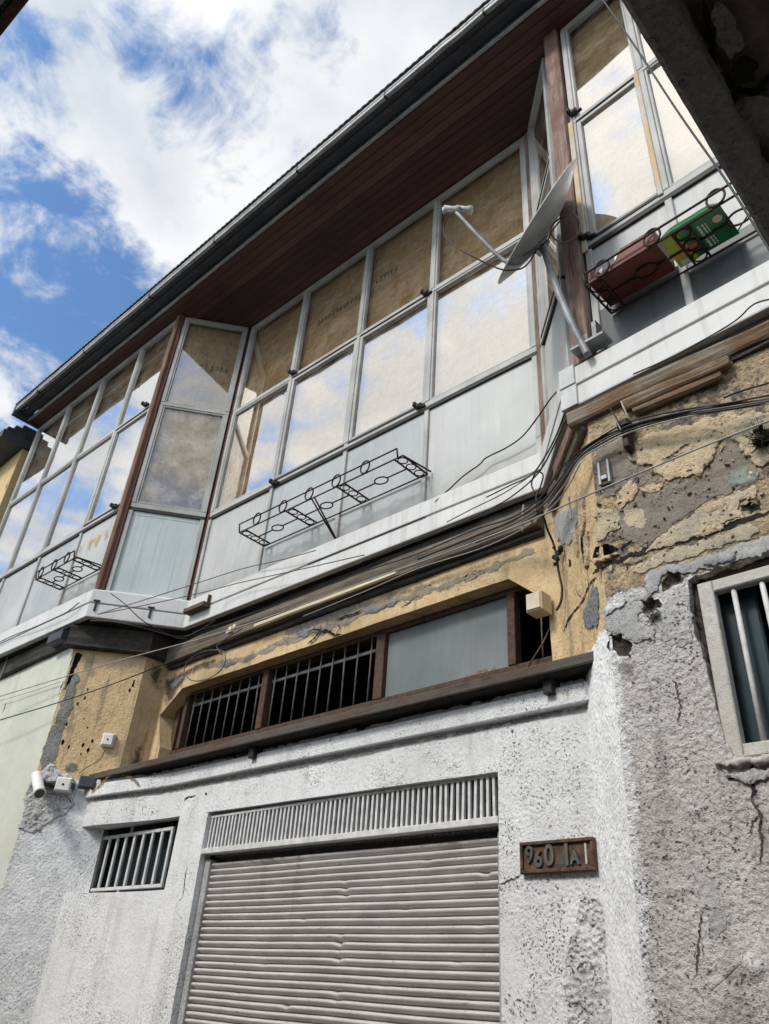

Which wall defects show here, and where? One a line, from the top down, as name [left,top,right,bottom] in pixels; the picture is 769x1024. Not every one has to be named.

flaking render [554,410,769,682]
spalling [204,548,536,669]
spalling [18,653,82,833]
crack [727,764,767,865]
crack [694,912,705,977]